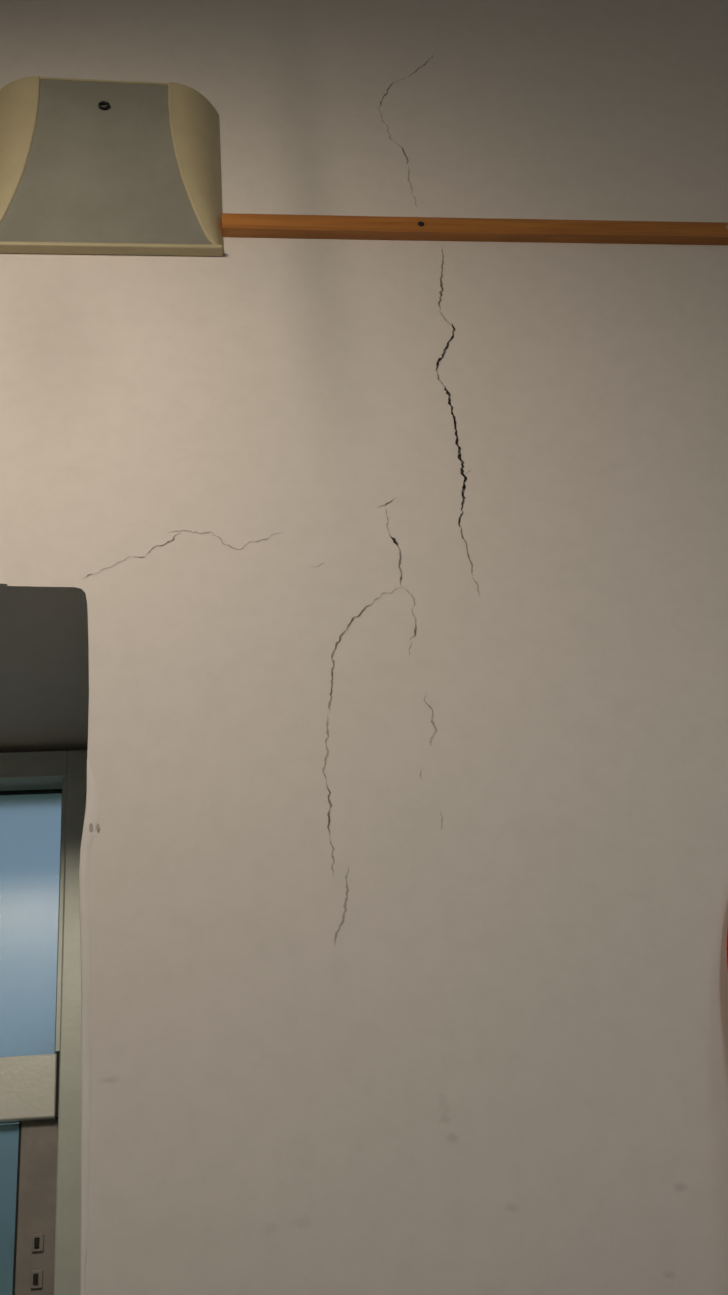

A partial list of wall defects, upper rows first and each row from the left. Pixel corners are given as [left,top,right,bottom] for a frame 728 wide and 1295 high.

crack [436,250,473,573]
crack [379,498,402,584]
crack [328,604,372,709]
crack [325,782,333,832]